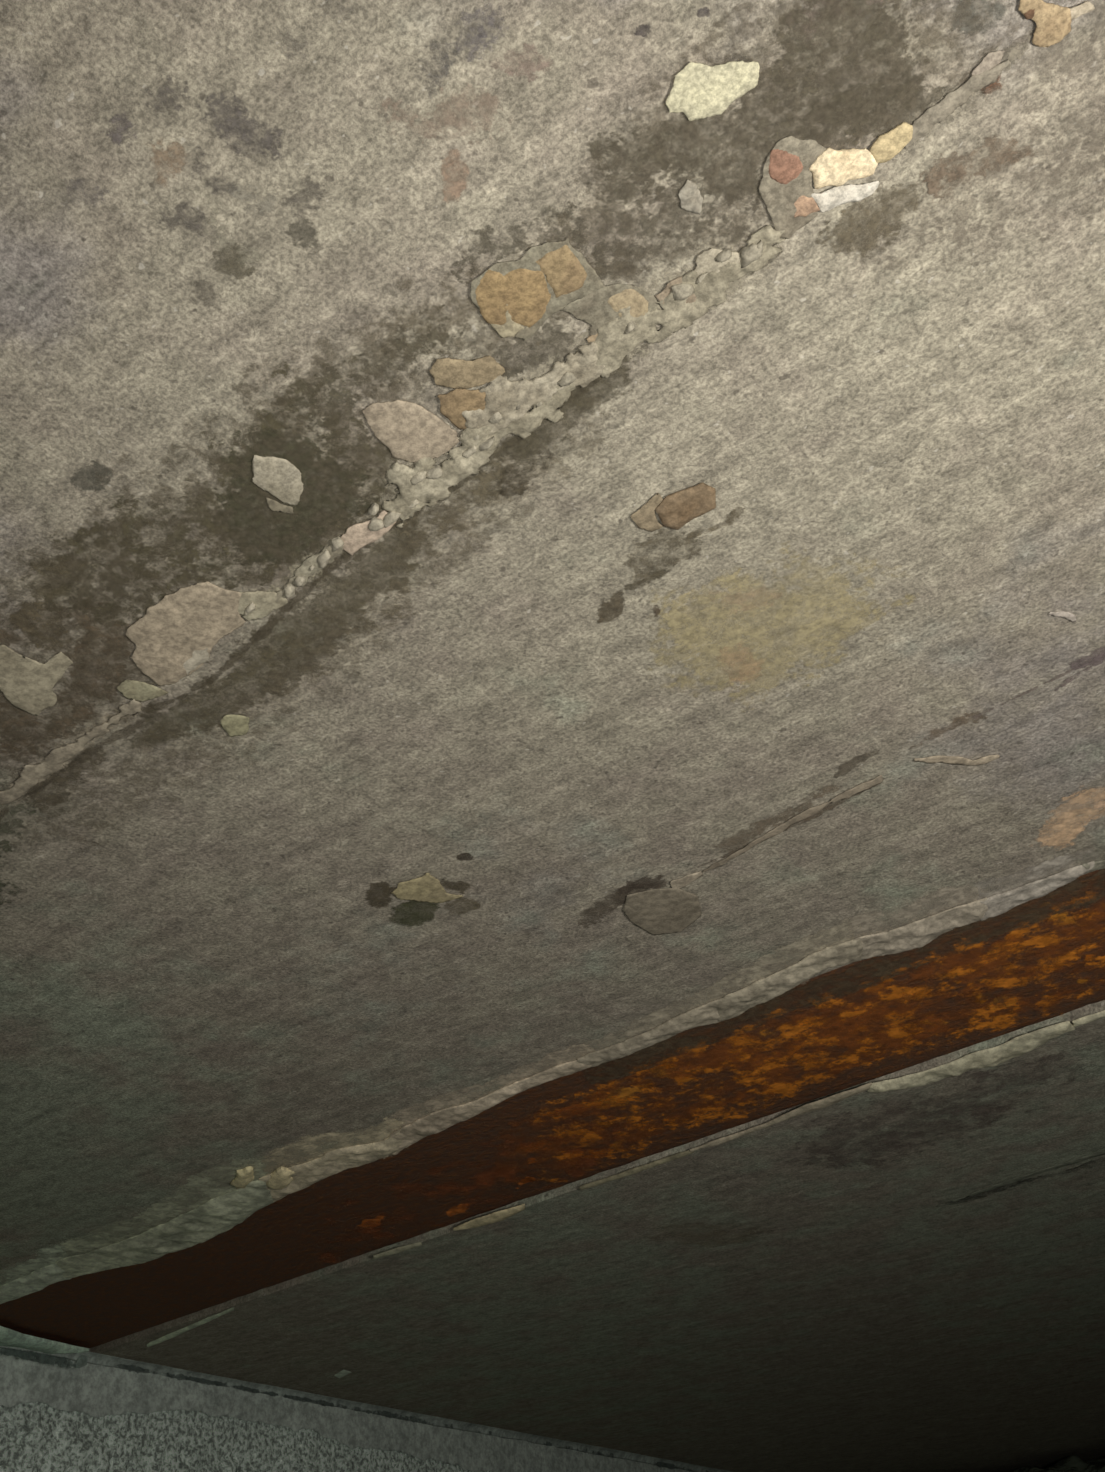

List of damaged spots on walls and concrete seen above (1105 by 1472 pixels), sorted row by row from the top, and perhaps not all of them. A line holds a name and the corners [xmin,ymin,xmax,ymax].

spalling [666,60,760,121]
crack [900,29,1035,155]
spalling [759,122,913,239]
spalling [252,455,304,514]
crack [0,202,786,821]
leakage [0,0,1038,857]
crack [911,611,1105,766]
leakage [366,879,480,927]
crack [578,752,883,925]
leakage [1038,789,1105,847]
spalling [0,849,1105,1304]
rust [432,869,1105,1216]